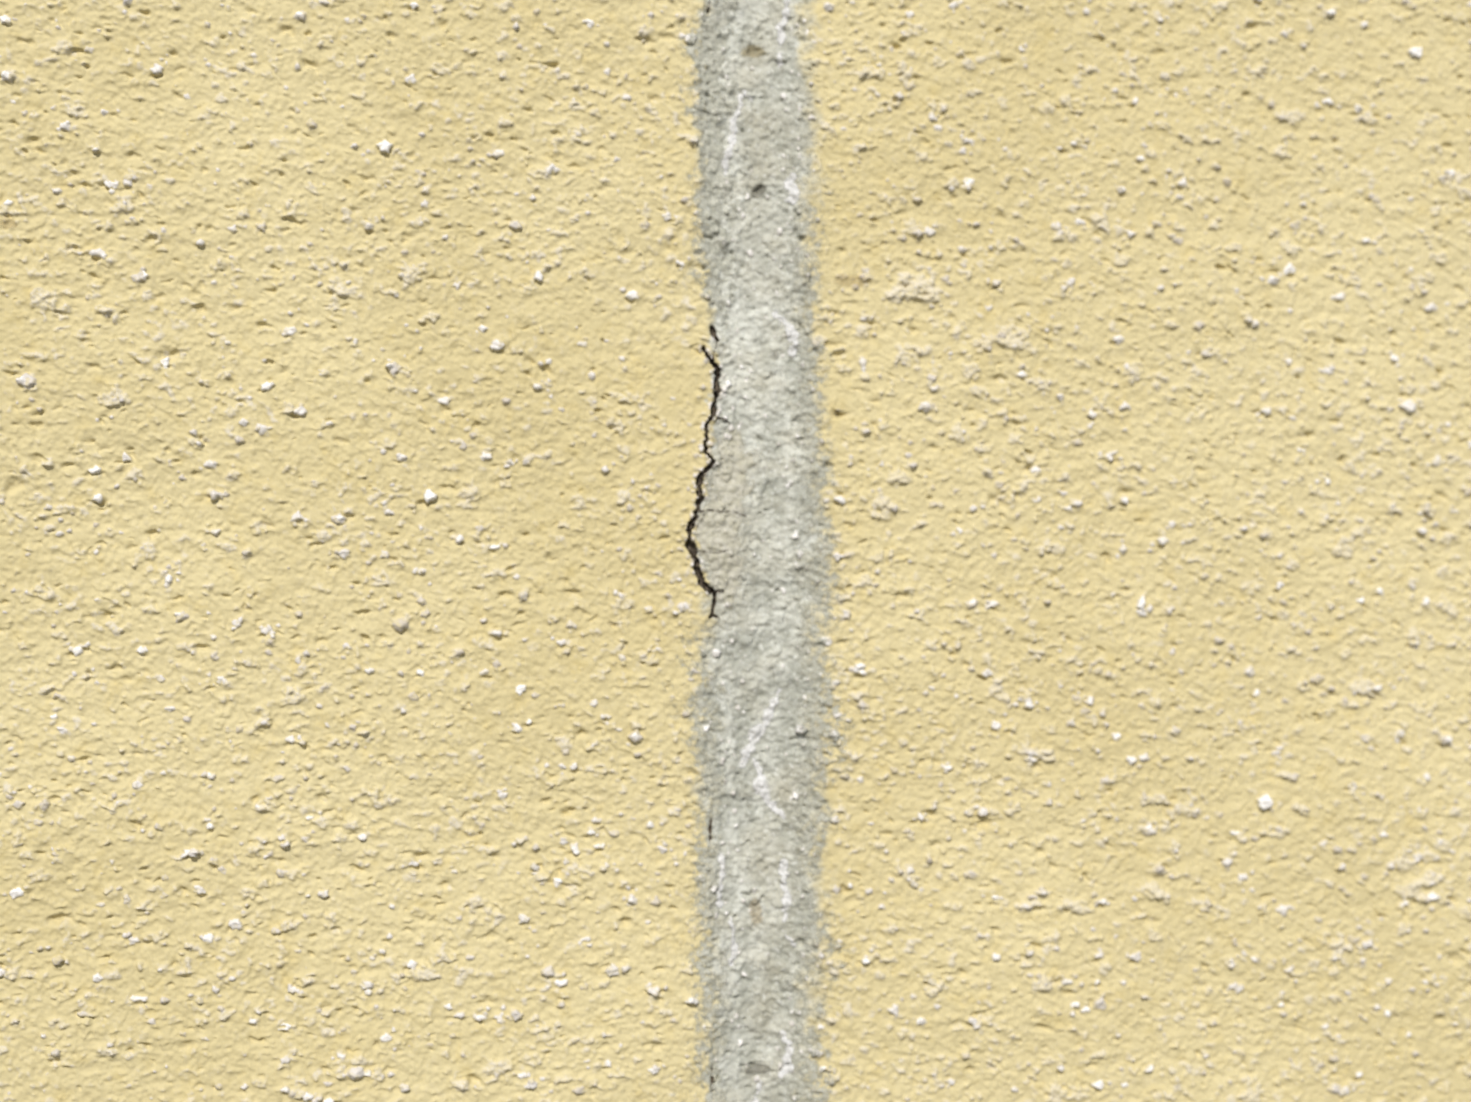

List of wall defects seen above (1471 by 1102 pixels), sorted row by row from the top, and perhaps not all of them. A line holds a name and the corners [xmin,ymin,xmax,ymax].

crack [686,327,746,619]